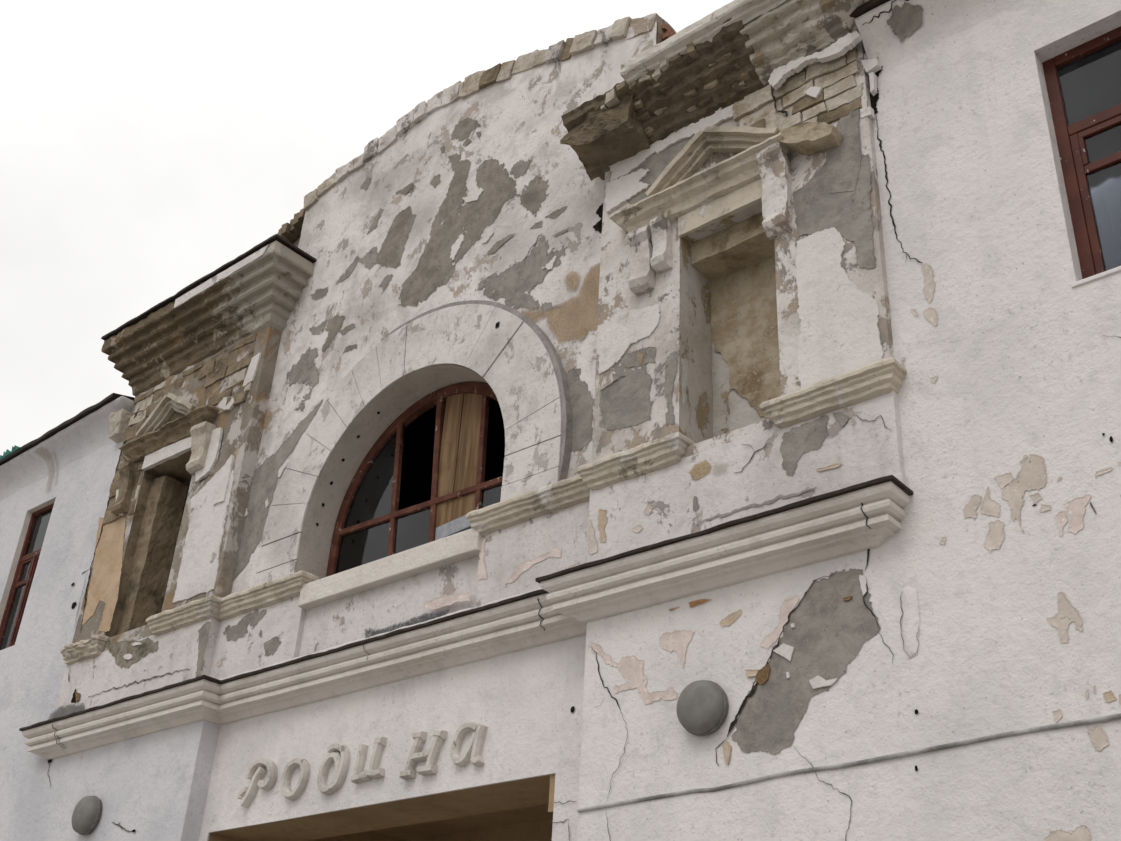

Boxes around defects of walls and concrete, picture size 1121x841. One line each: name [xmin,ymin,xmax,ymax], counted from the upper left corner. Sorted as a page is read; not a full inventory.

crack [862,0,909,26]
peeling [887,2,923,42]
spalling [311,117,568,314]
flaking render [604,31,876,269]
crack [876,115,922,263]
spalling [566,346,688,452]
spalling [82,334,261,669]
spalling [223,609,281,656]
spalling [720,568,881,765]
crack [551,801,576,841]
crack [592,649,628,841]
crack [795,748,852,841]